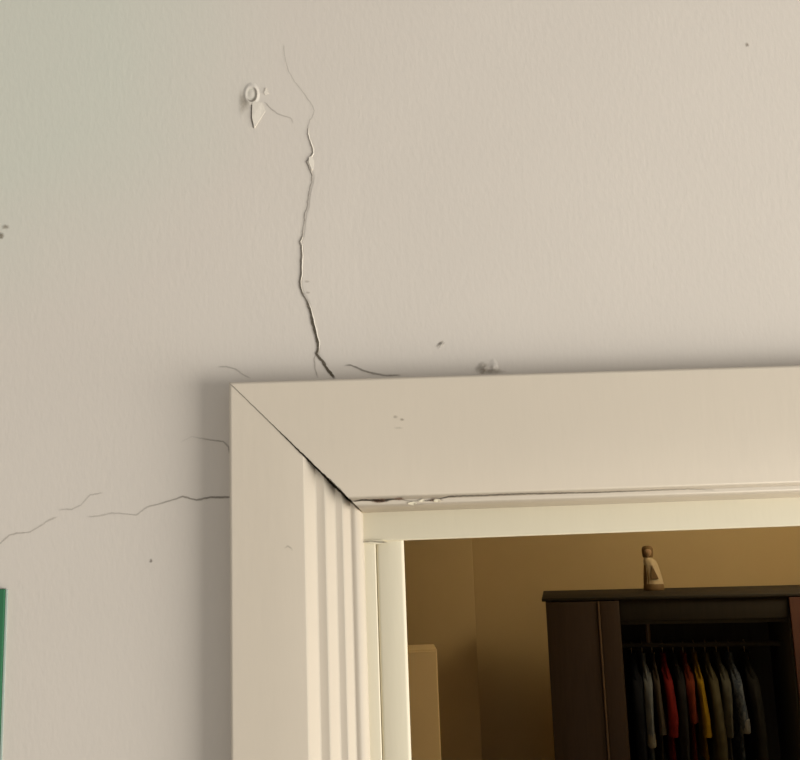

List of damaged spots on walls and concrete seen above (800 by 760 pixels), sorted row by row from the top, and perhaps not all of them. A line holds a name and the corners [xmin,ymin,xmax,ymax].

crack [299,129,334,378]